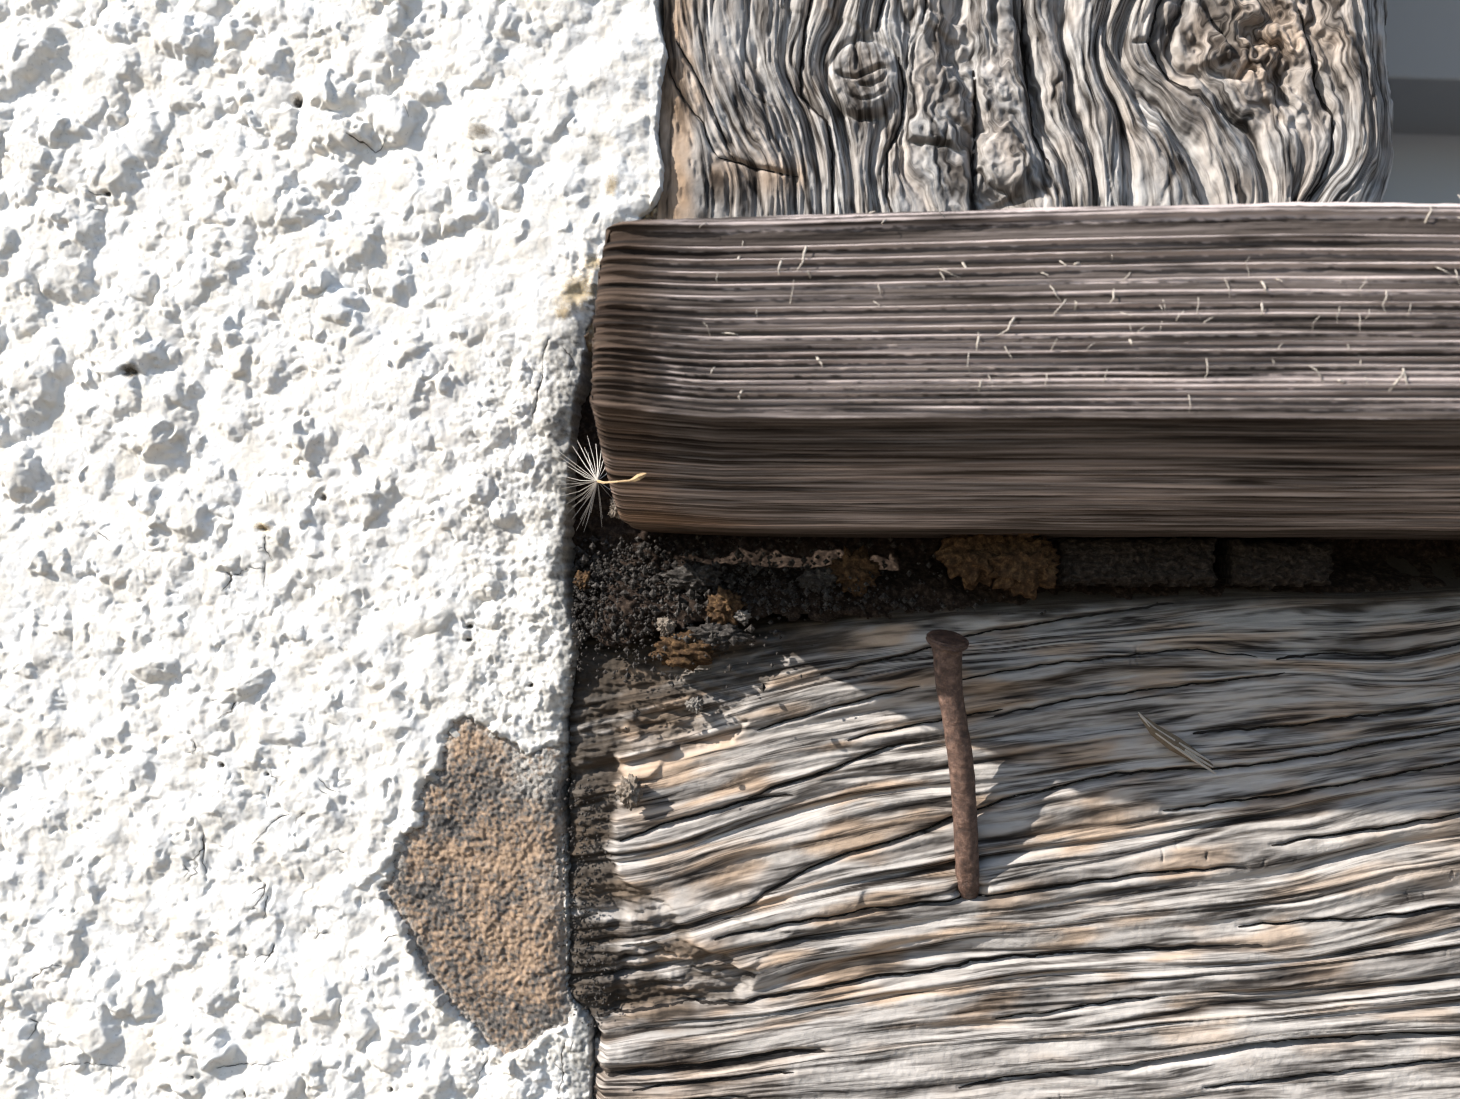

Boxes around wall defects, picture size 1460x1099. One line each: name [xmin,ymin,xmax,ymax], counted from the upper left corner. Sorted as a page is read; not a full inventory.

spalling [377,718,574,1055]